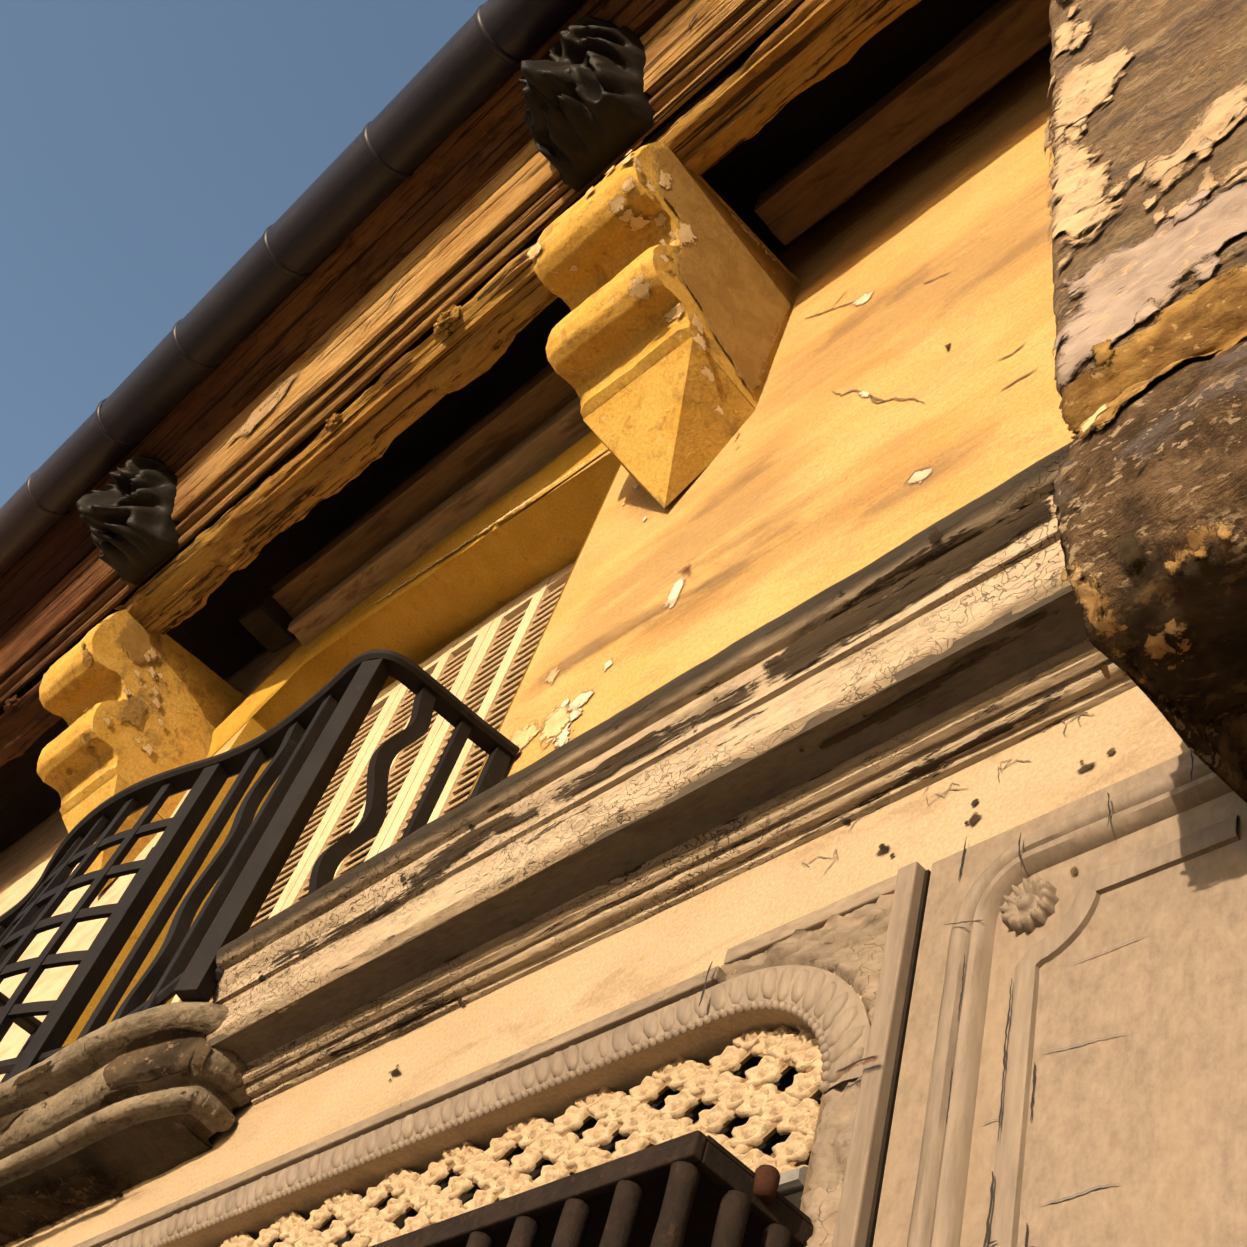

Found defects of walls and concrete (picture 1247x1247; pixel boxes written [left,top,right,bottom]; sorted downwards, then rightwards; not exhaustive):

peeling [527,240,543,260]
peeling [605,140,798,393]
peeling [1043,0,1247,443]
crack [832,389,924,404]
spalling [904,465,932,485]
peeling [372,448,608,607]
peeling [1164,518,1233,575]
peeling [81,641,92,668]
peeling [102,605,171,756]
peeling [258,483,1058,982]
peeling [325,987,471,1058]